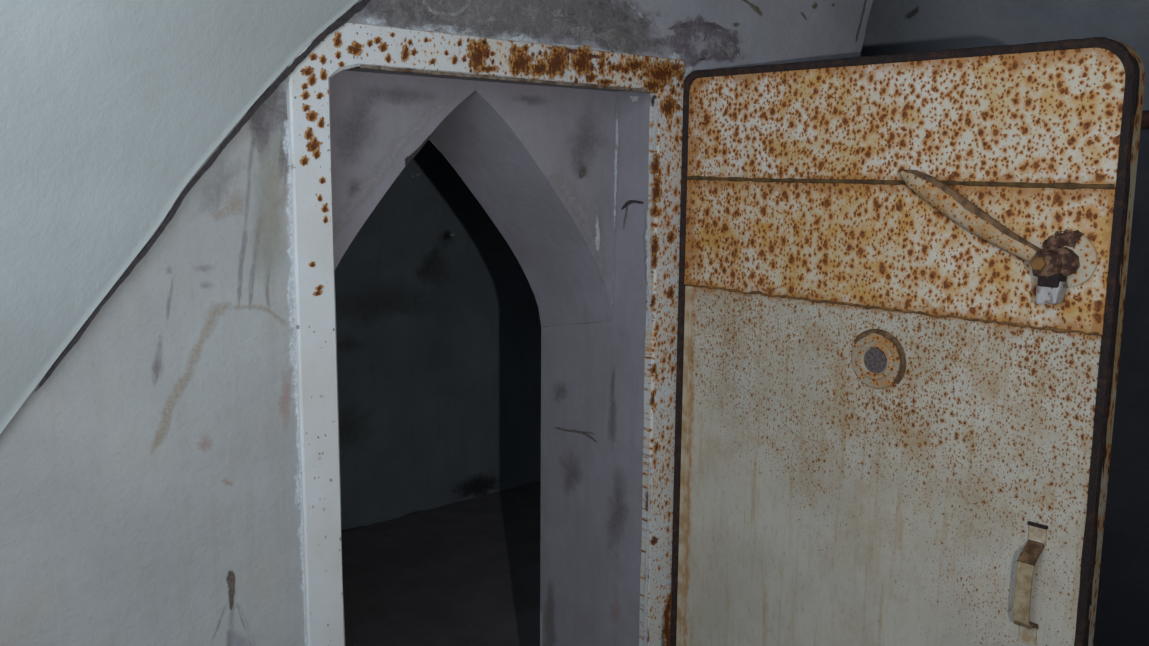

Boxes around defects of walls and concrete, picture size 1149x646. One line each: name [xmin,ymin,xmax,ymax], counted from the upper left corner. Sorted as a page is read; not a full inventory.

rust [300,31,1140,646]